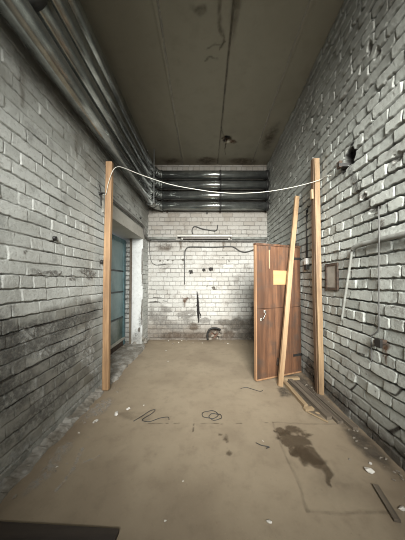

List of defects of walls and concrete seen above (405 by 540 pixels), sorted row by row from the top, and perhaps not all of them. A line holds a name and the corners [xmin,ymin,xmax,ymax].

spalling [342,142,358,174]
leakage [276,426,333,486]